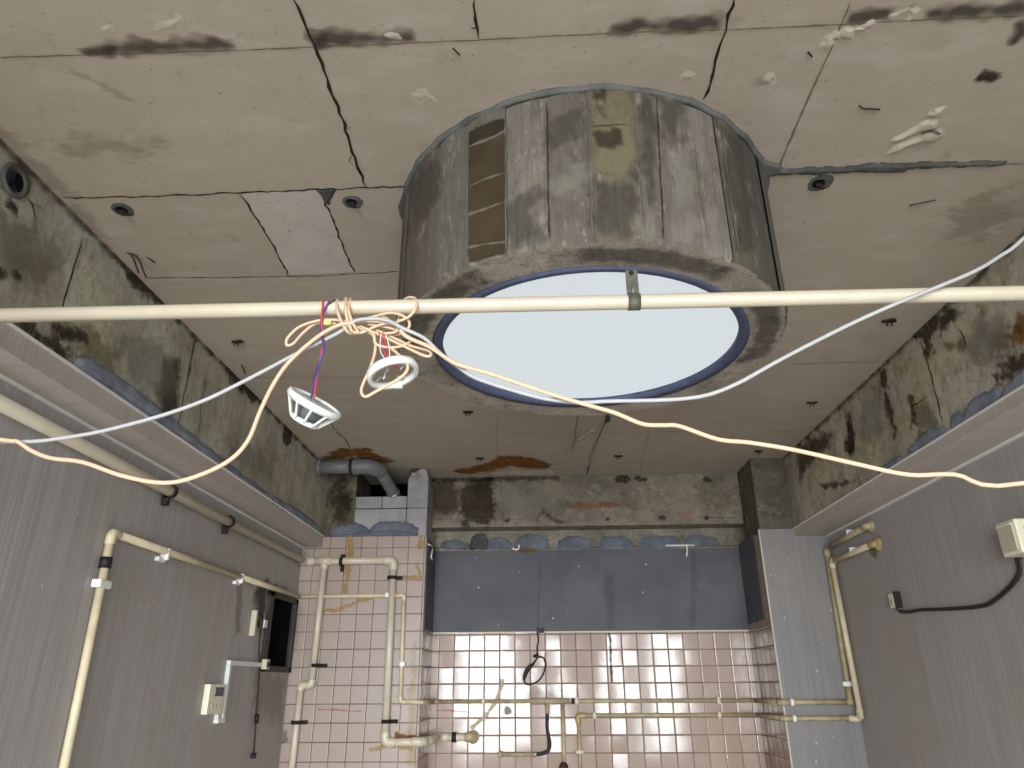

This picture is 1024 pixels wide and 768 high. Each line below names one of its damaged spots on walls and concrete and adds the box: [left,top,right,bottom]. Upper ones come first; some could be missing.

damp [83,37,231,55]
crack [703,0,735,100]
flaking render [817,4,921,53]
crack [780,2,851,164]
crack [27,0,404,277]
flaking render [846,105,948,173]
damp [16,322,88,360]
rust [323,448,393,463]
rust [455,456,551,474]
damp [797,433,832,476]
damp [432,468,559,527]
rust [322,536,372,613]